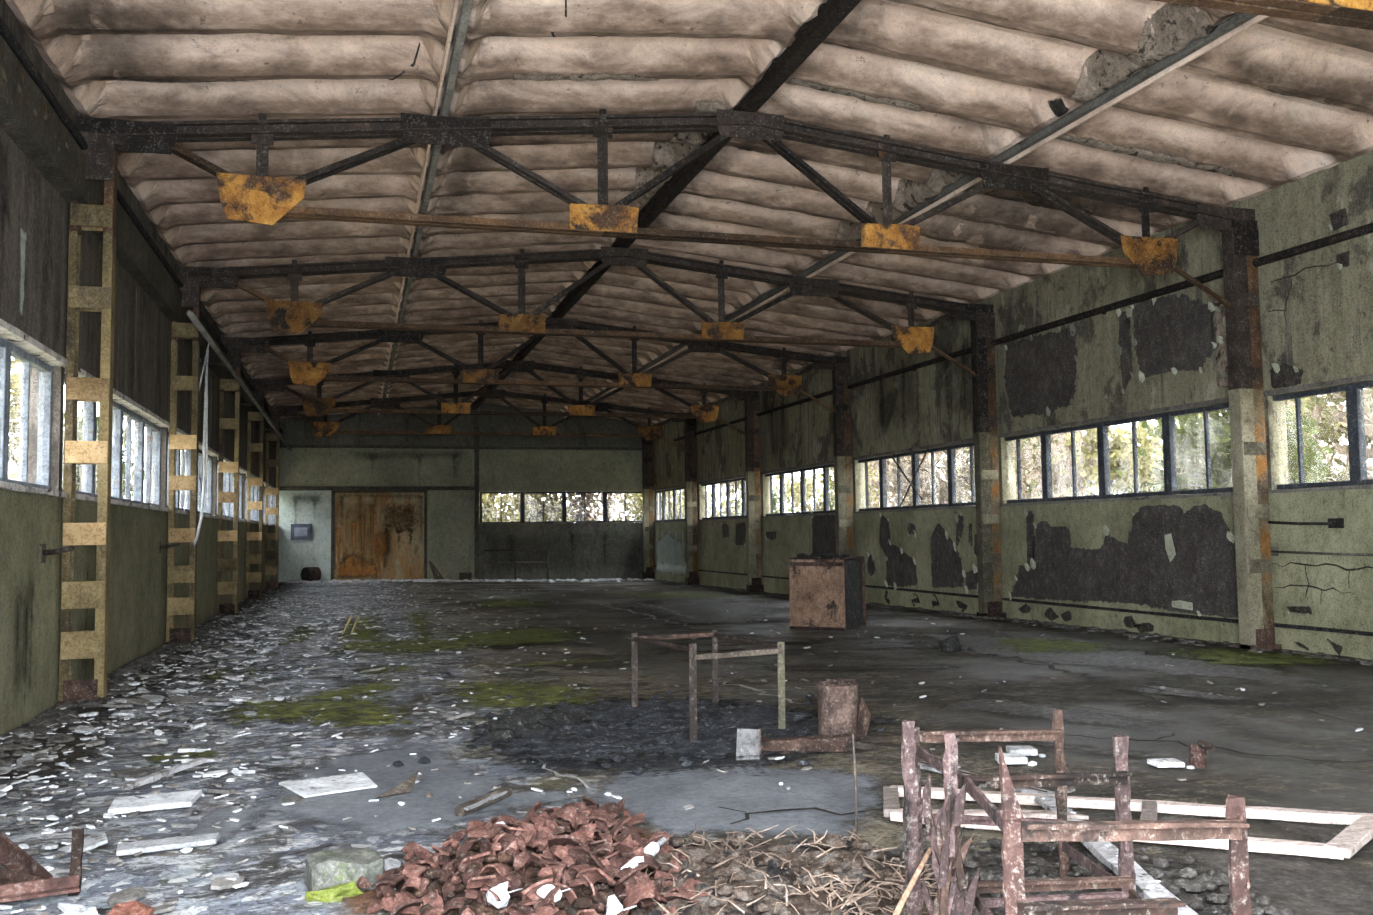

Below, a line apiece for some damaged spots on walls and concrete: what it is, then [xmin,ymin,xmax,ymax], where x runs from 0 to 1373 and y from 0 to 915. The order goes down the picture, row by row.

peeling [1002,324,1078,420]
peeling [1114,291,1228,394]
corrosion [337,504,416,578]
peeling [865,511,978,594]
peeling [1008,504,1238,633]
crack [1272,562,1373,598]